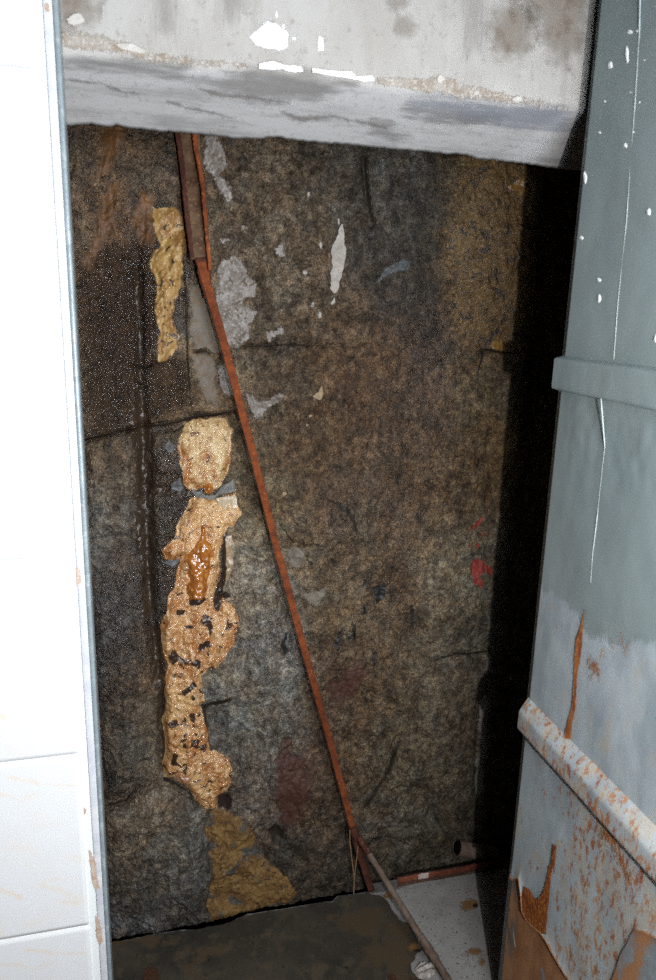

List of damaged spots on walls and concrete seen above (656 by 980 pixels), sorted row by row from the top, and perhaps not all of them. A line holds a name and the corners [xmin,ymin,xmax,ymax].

damp [496,0,581,54]
damp [78,207,422,980]
corrosion [563,610,601,740]